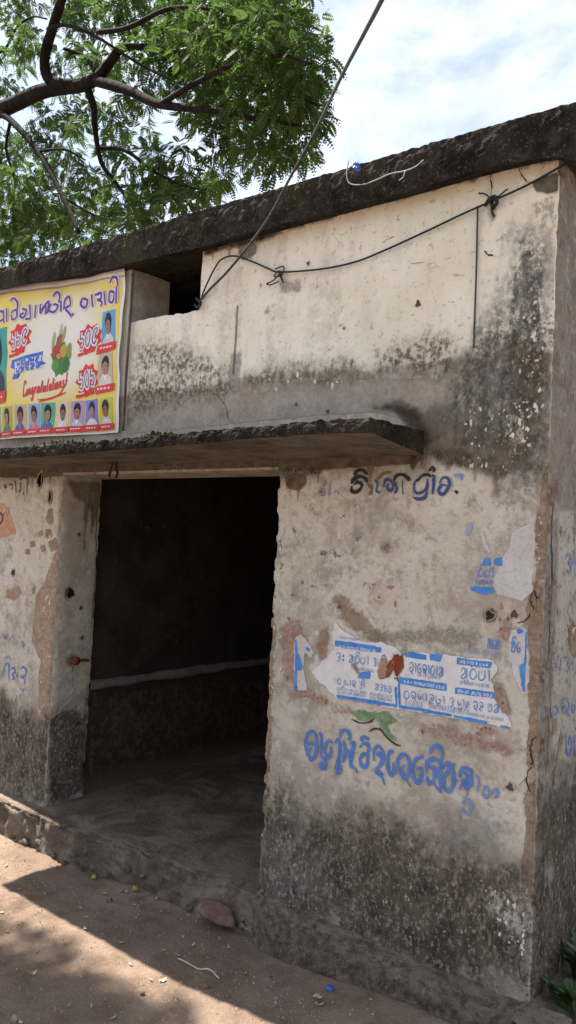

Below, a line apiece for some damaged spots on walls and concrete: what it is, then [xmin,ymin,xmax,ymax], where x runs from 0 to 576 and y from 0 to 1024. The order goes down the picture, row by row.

damp [0,232,548,548]
spalling [0,503,59,722]
damp [0,692,86,802]
crack [523,736,537,793]
damp [260,790,576,986]